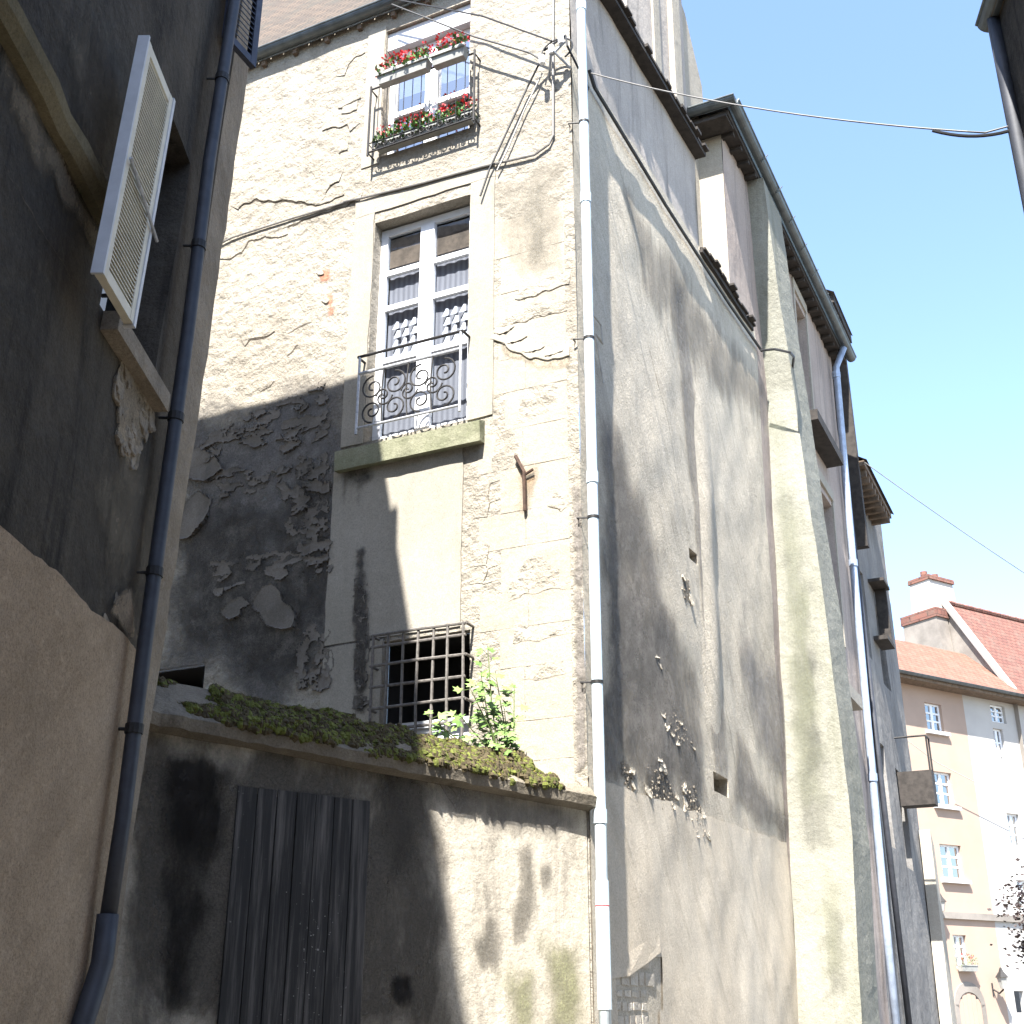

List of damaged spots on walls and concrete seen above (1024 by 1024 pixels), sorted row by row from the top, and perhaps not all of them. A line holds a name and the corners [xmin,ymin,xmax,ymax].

crack [220,44,365,260]
crack [502,268,572,327]
spalling [112,360,156,470]
peeling [179,382,334,693]
damp [159,387,370,704]
flaking render [682,574,694,606]
flaking render [660,711,696,752]
flaking render [620,757,711,842]
damp [129,736,449,1024]
damp [514,849,550,933]
damp [477,918,496,962]
damp [552,950,576,1024]